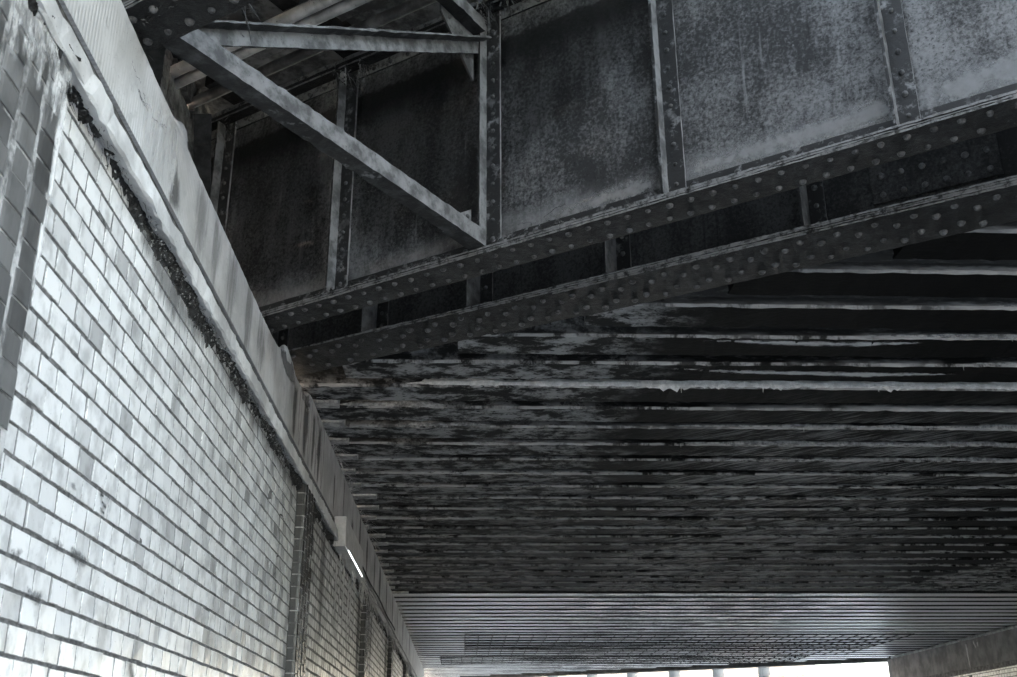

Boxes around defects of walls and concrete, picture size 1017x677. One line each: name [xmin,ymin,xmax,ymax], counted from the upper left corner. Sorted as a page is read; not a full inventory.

water stain [723,333,1017,346]
water stain [408,369,1017,393]
water stain [340,400,445,408]